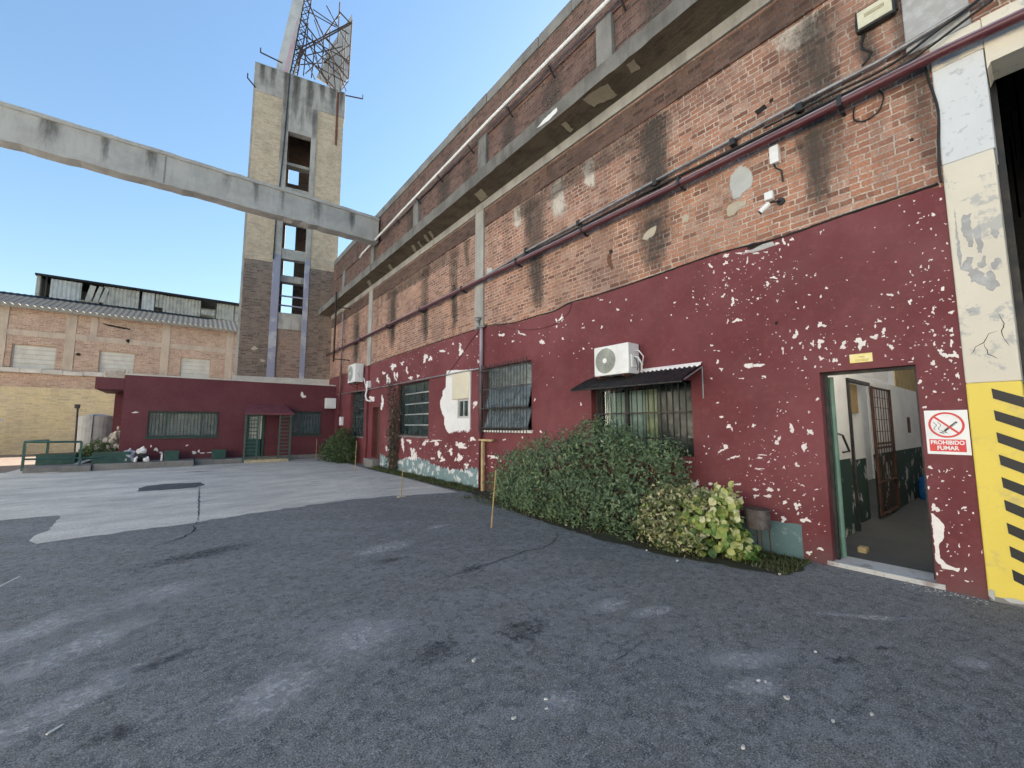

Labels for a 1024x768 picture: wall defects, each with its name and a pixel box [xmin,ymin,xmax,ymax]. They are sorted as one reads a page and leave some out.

damp [782,14,833,198]
damp [548,120,664,262]
peeling [369,341,479,410]
damp [514,202,541,297]
peeling [710,345,766,387]
peeling [686,238,816,324]
peeling [772,200,1002,409]
crack [972,315,1010,358]
peeling [385,436,501,469]
peeling [927,466,982,582]